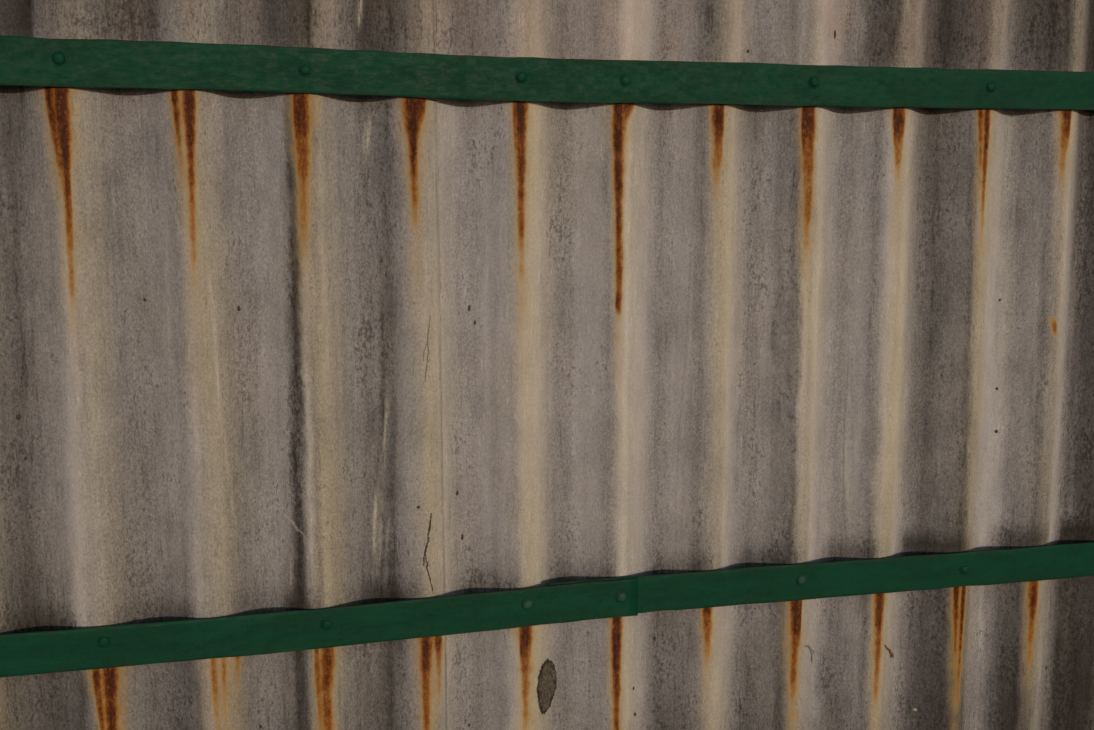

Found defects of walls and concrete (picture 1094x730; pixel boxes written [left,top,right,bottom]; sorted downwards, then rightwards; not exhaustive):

corrosion [24,86,94,405]
corrosion [158,89,220,471]
corrosion [278,92,327,381]
corrosion [385,96,438,355]
corrosion [498,101,541,493]
corrosion [596,103,639,497]
corrosion [787,106,824,380]
corrosion [78,665,139,730]
corrosion [304,646,345,730]
corrosion [402,635,453,730]
corrosion [503,625,543,730]
spalling [537,659,557,715]